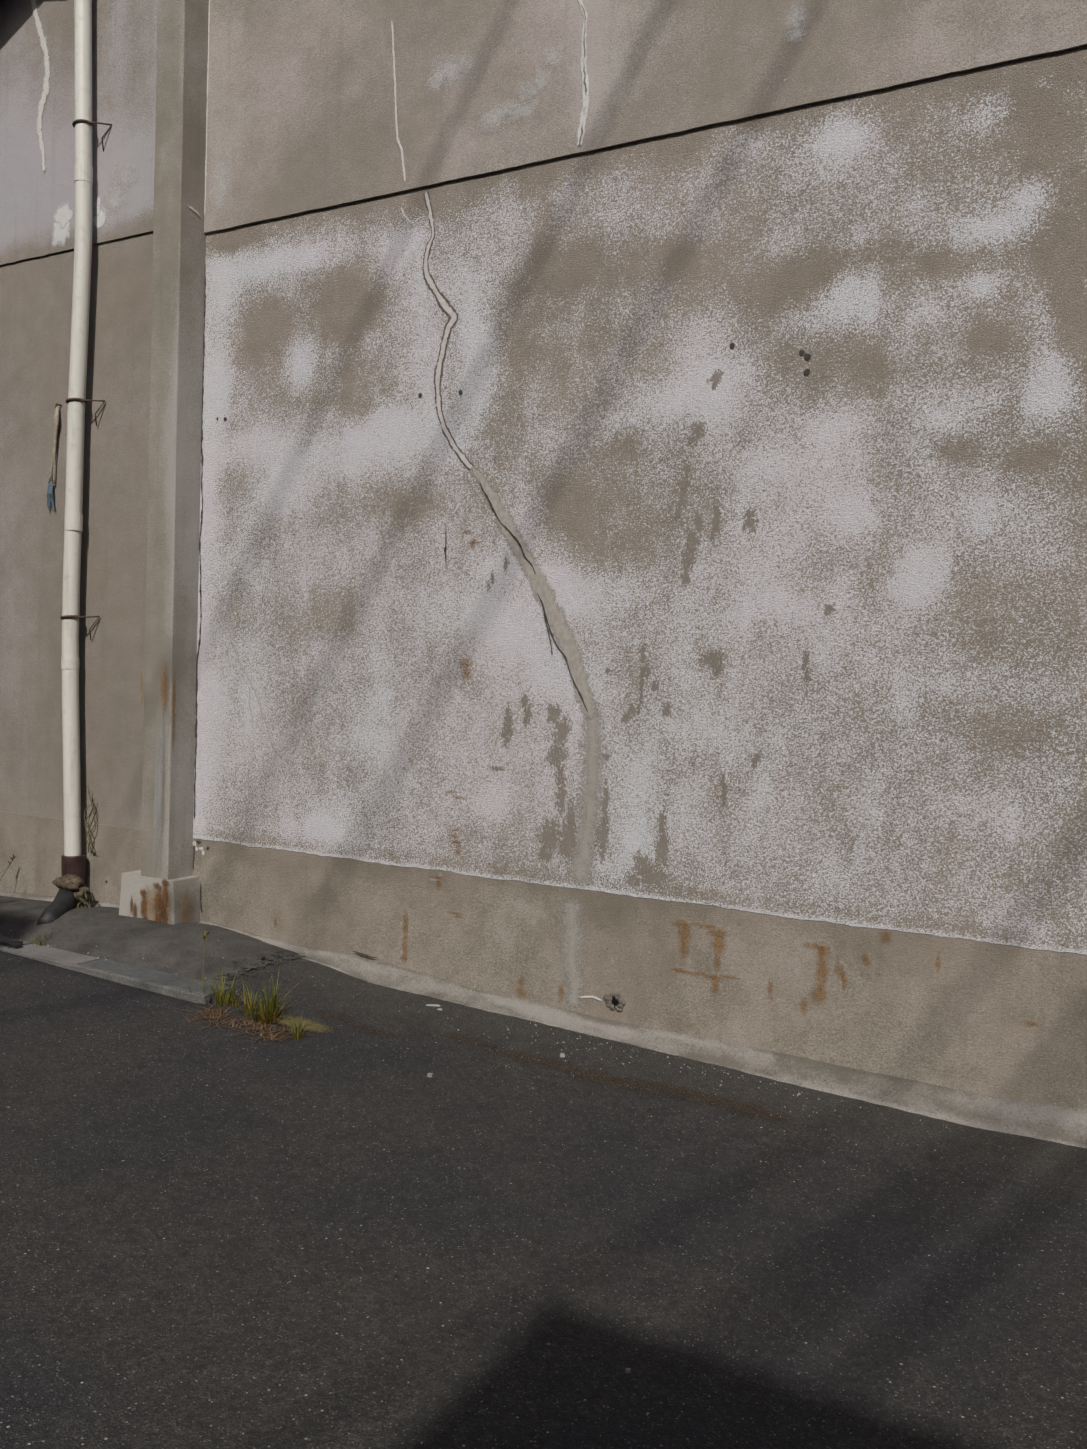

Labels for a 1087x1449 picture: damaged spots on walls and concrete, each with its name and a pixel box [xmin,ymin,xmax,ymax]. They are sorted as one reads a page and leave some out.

crack [31,0,50,171]
crack [391,0,604,1007]